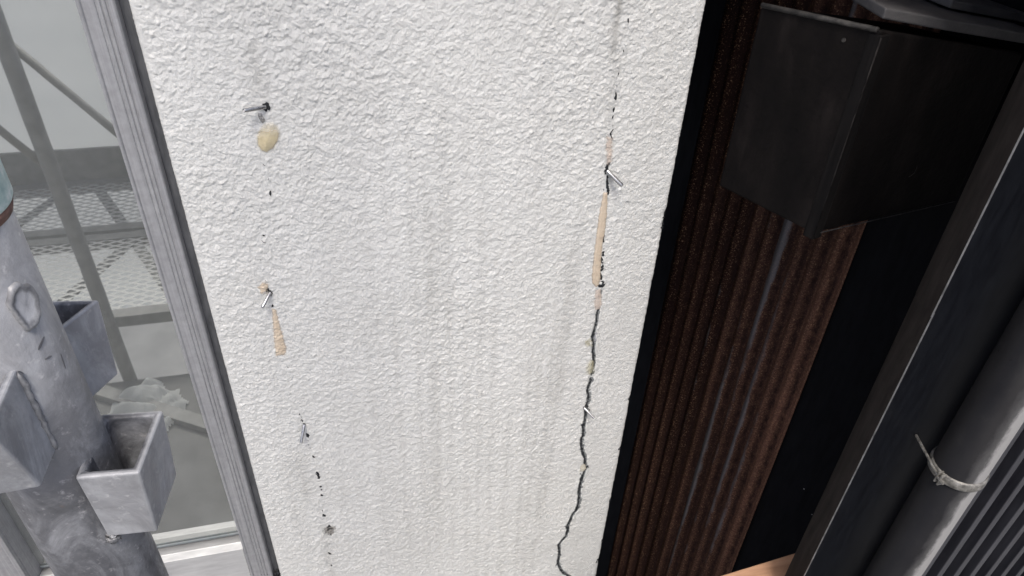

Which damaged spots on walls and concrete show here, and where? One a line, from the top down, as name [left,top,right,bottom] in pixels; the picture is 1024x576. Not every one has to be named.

crack [603,50,624,195]
crack [555,224,606,576]